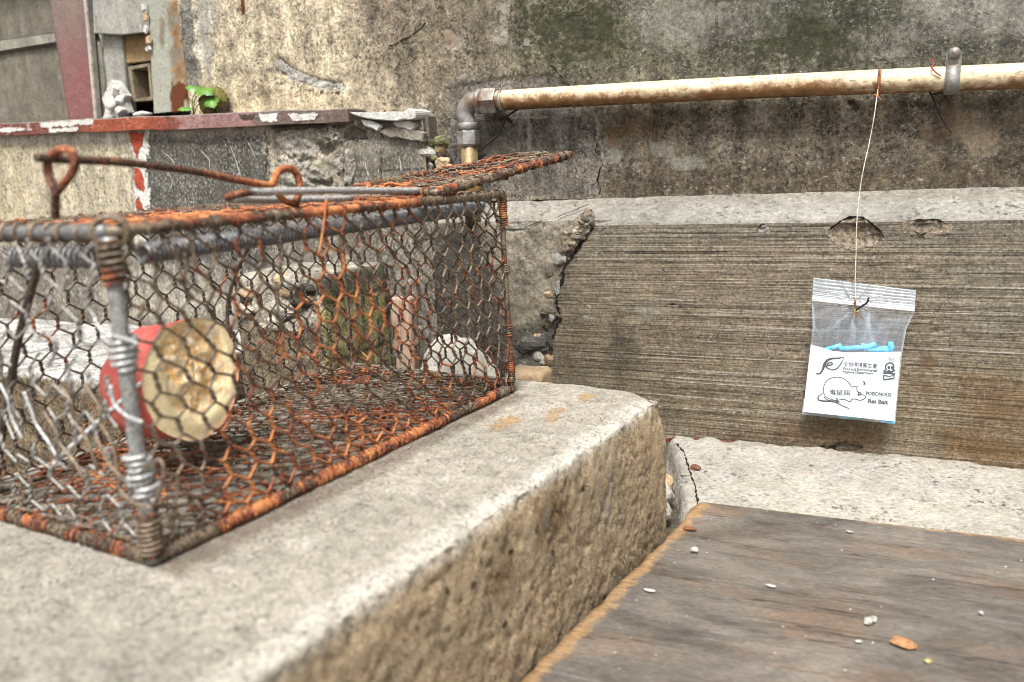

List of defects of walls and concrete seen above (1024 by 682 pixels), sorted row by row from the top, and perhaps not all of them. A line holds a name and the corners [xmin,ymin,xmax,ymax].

peeling [0,118,94,133]
spalling [828,216,884,252]
spalling [901,218,953,238]
spalling [533,209,595,367]
crack [677,443,699,504]